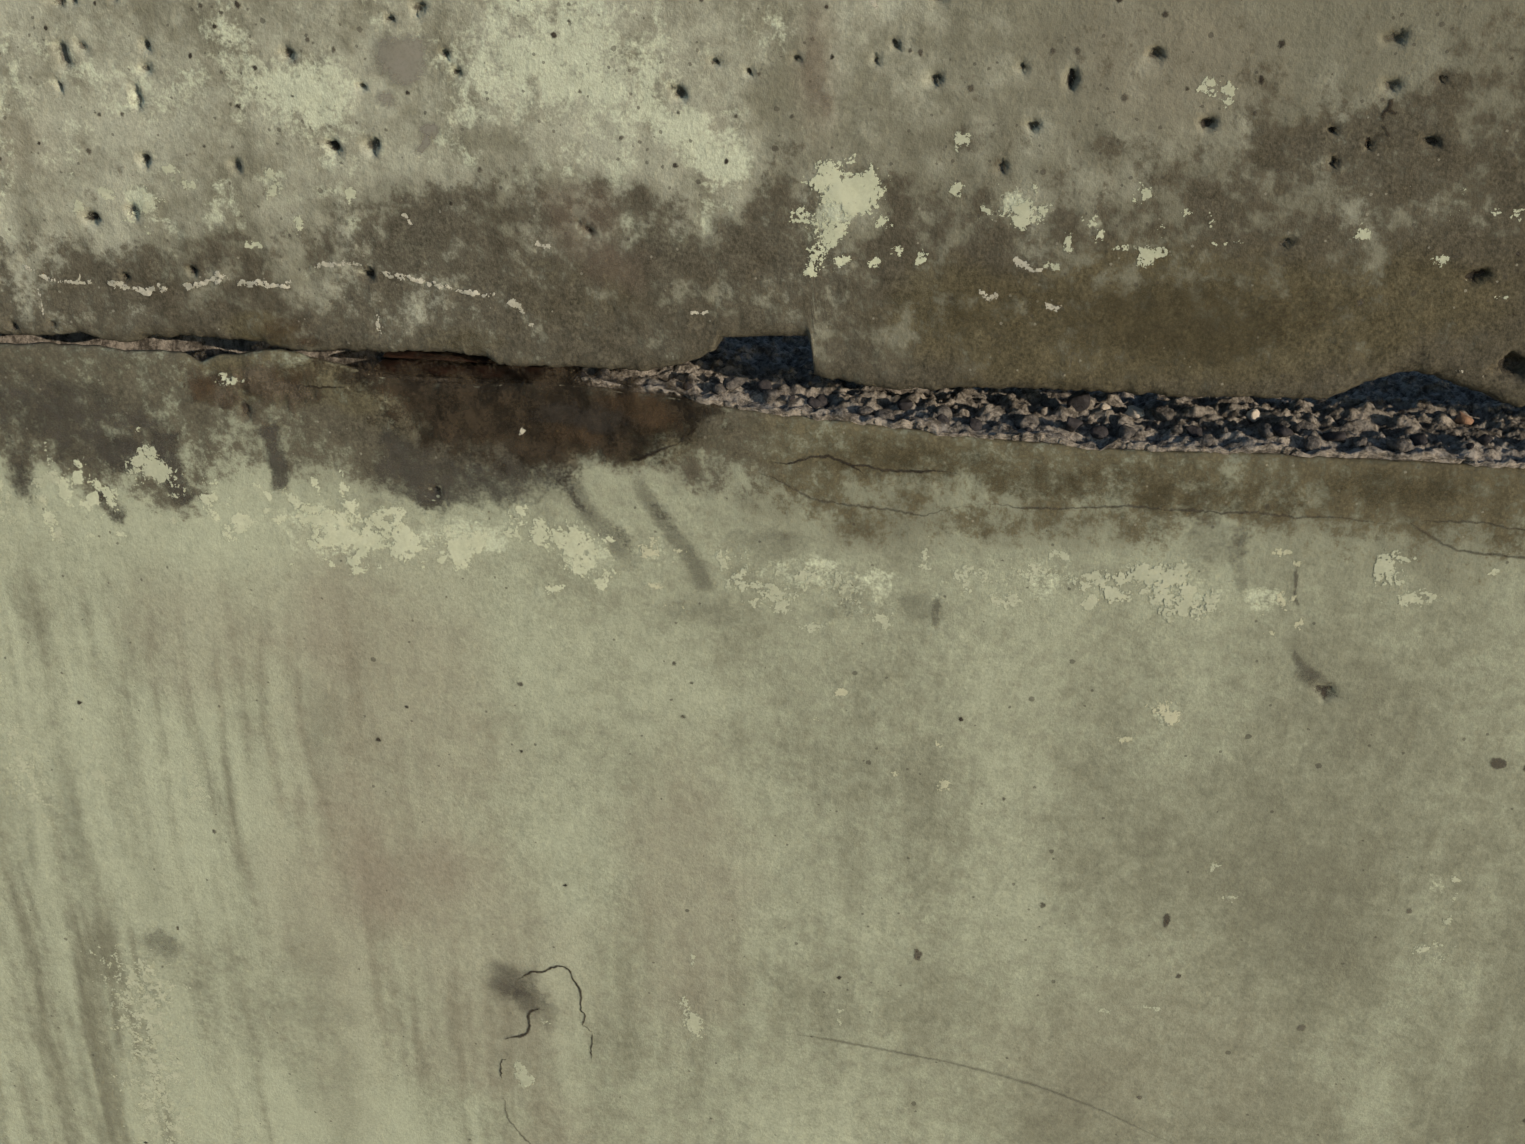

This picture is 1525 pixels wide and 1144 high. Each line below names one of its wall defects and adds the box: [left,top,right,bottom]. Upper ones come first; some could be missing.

spalling [1497,356,1521,373]
water stain [0,373,194,505]
water stain [98,492,125,523]
water stain [260,426,288,489]
water stain [376,432,584,509]
crack [499,965,593,1078]